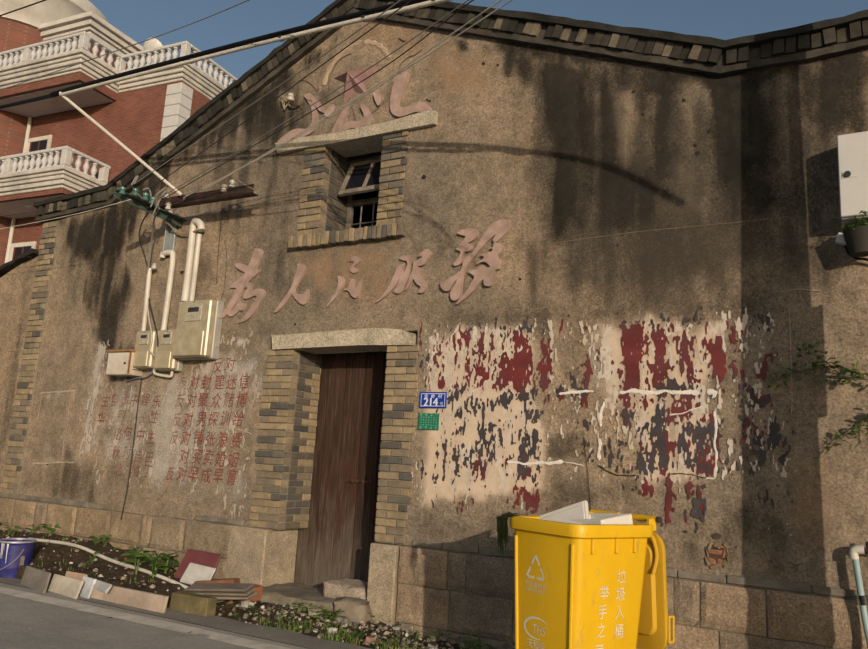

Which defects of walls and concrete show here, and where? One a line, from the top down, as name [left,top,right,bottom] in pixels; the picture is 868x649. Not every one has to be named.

water stain [61,161,171,395]
water stain [199,70,304,215]
water stain [498,41,868,313]
peeling [78,327,266,519]
peeling [411,306,796,570]